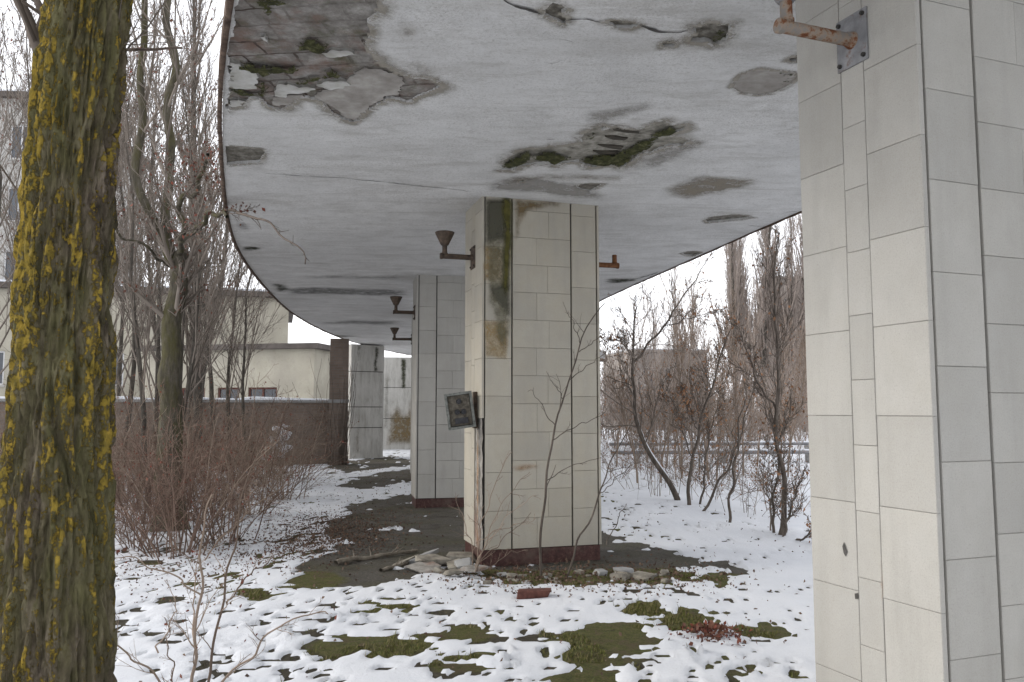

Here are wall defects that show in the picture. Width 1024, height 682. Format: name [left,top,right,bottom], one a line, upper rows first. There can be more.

crack [504,0,542,15]
crack [639,25,688,33]
spalling [225,0,450,125]
peeling [728,55,798,96]
spalling [496,119,699,183]
damp [673,178,749,198]